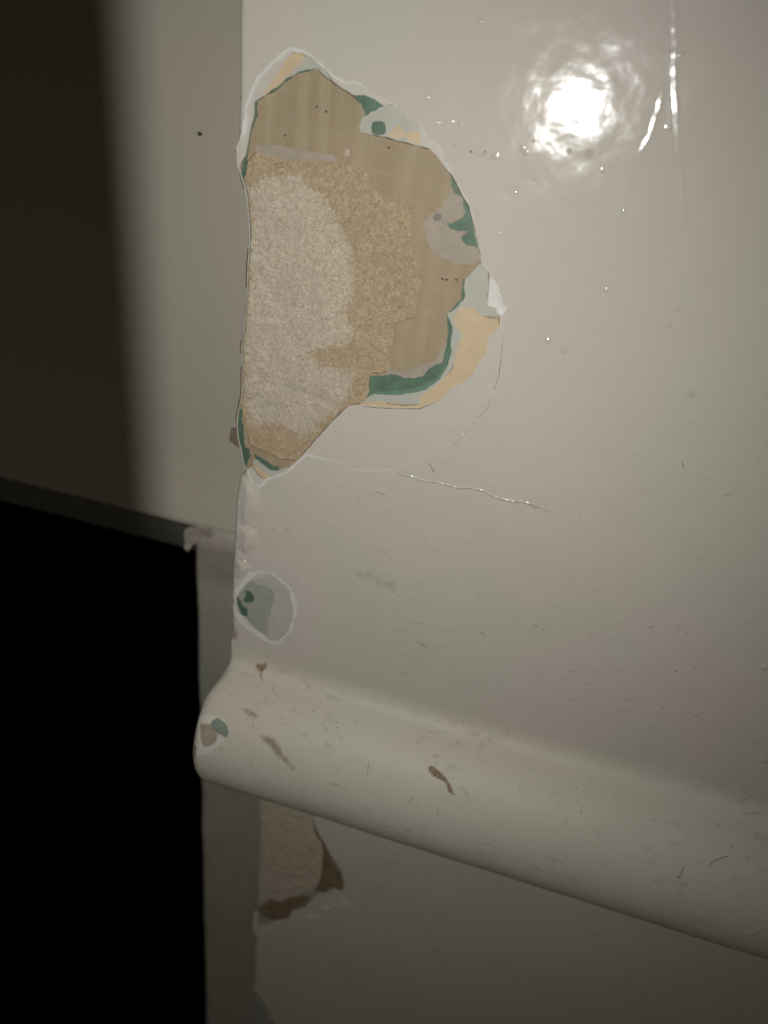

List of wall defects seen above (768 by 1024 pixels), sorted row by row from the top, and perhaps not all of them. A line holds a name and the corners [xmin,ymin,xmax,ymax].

peeling [229,47,508,488]
crack [395,470,553,511]
peeling [233,571,298,645]
peeling [253,798,357,937]